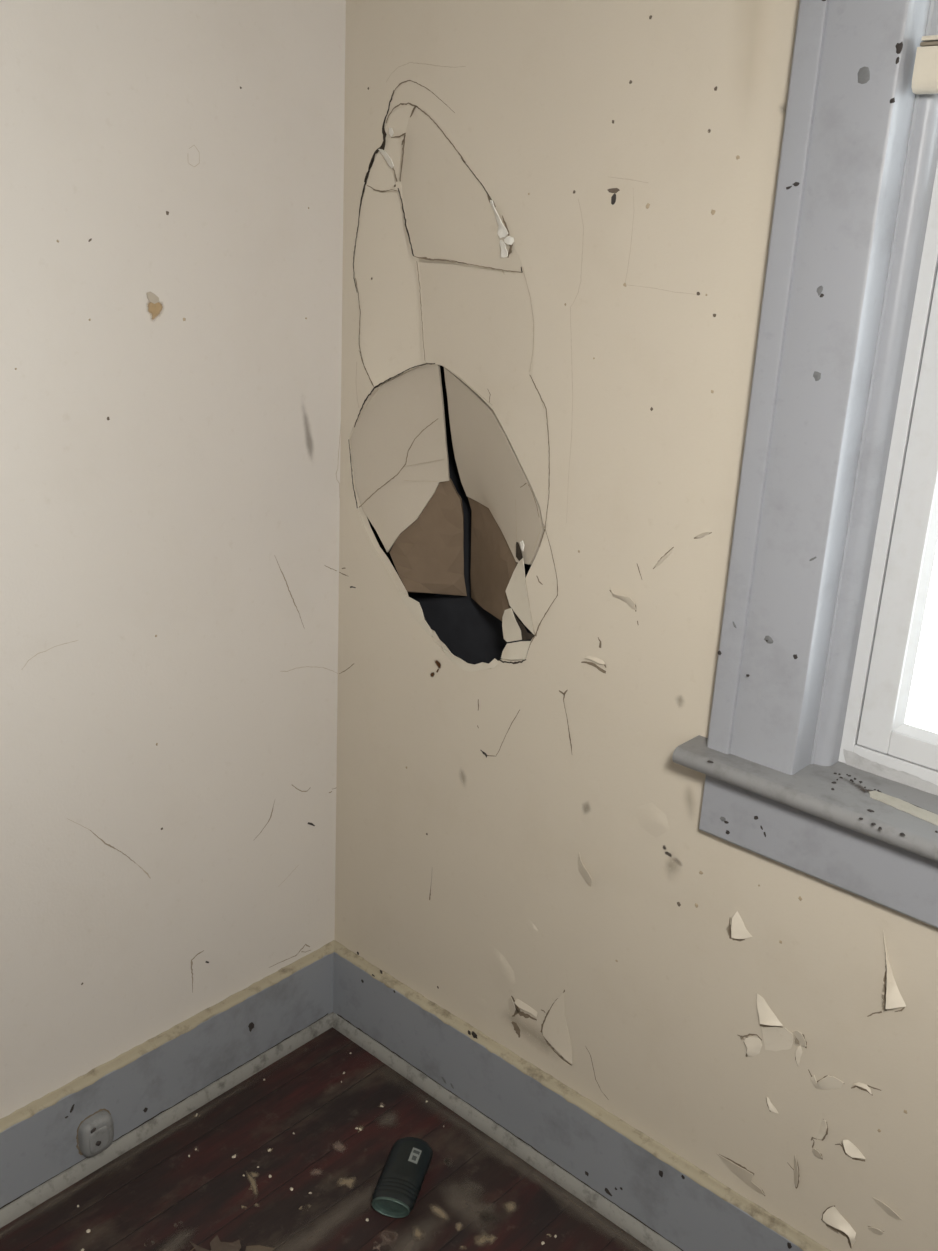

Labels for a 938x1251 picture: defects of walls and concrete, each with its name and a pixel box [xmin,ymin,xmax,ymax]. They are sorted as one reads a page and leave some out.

spalling [349,106,550,672]
crack [336,80,584,664]
peeling [727,911,752,941]
peeling [867,930,906,1017]
peeling [738,994,881,1095]
peeling [811,1119,866,1161]
peeling [821,1206,884,1248]